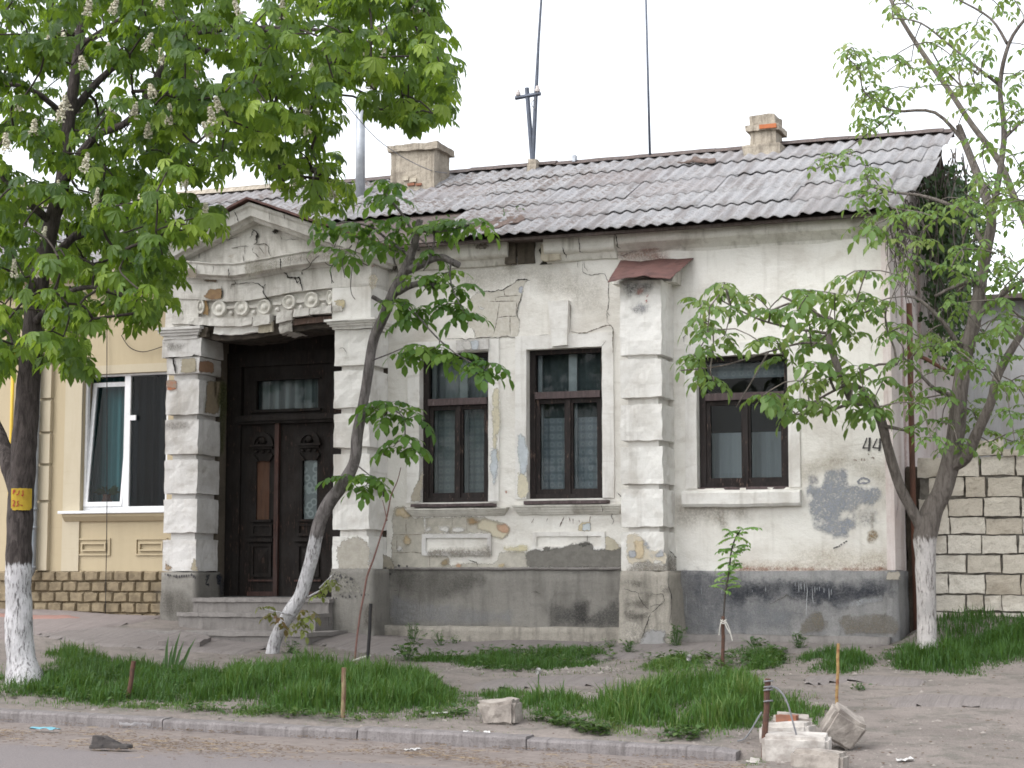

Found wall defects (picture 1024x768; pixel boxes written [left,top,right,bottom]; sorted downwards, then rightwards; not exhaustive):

flaking render [185,268,222,315]
crack [182,213,303,303]
crack [562,235,638,353]
peeling [490,388,500,483]
peeling [517,434,529,498]
peeling [329,536,370,595]
peeling [383,471,528,569]
peeling [605,533,667,565]
crack [626,550,677,637]